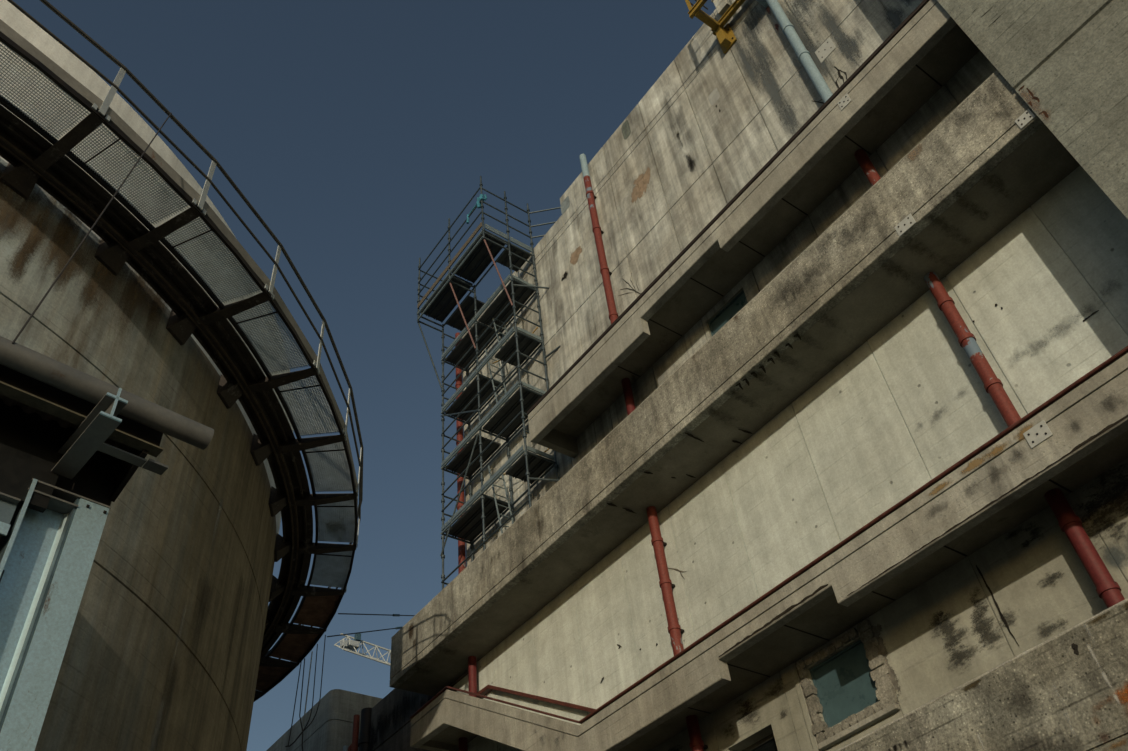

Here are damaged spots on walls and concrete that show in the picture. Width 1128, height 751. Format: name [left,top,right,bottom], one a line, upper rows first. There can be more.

damp [0,182,116,306]
damp [1080,468,1128,566]
damp [932,590,1014,666]
crack [976,565,1019,646]
damp [1040,622,1065,637]